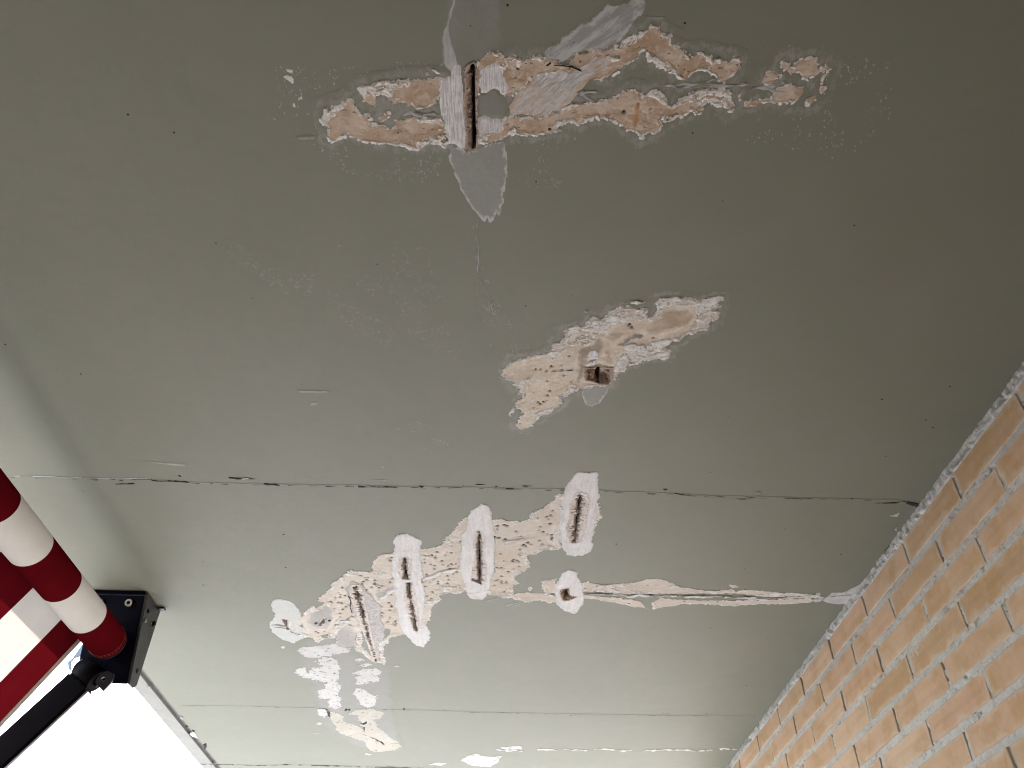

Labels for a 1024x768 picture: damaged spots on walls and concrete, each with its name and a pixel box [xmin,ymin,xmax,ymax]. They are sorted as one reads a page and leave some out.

flaking render [293,65,458,156]
flaking render [471,16,845,153]
flaking render [498,290,733,434]
crack [6,466,565,491]
crack [598,489,919,531]
flaking render [281,493,603,755]